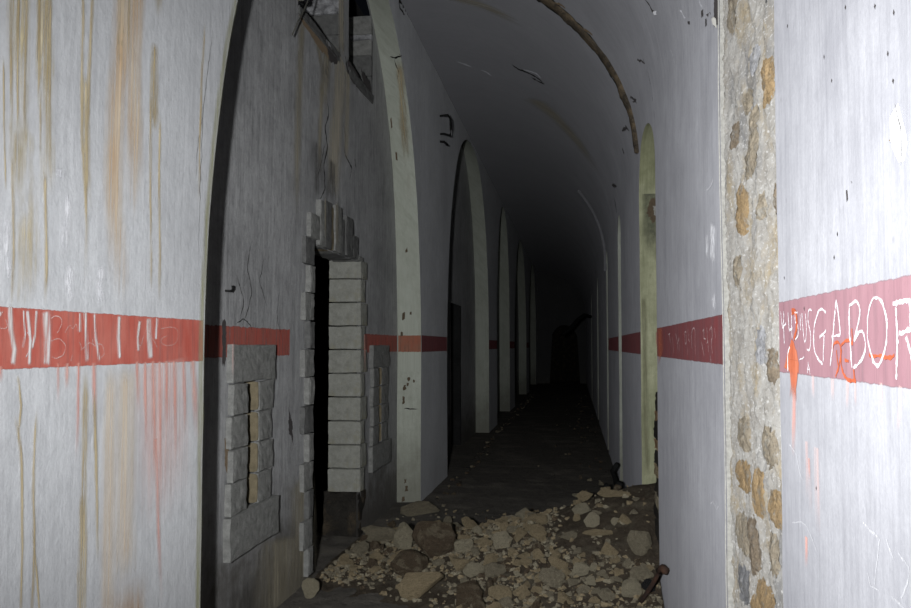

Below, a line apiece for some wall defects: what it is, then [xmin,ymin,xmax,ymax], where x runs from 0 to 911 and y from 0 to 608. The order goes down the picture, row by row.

corrosion [109,0,141,227]
peeling [647,198,656,223]
flaking render [699,0,785,608]